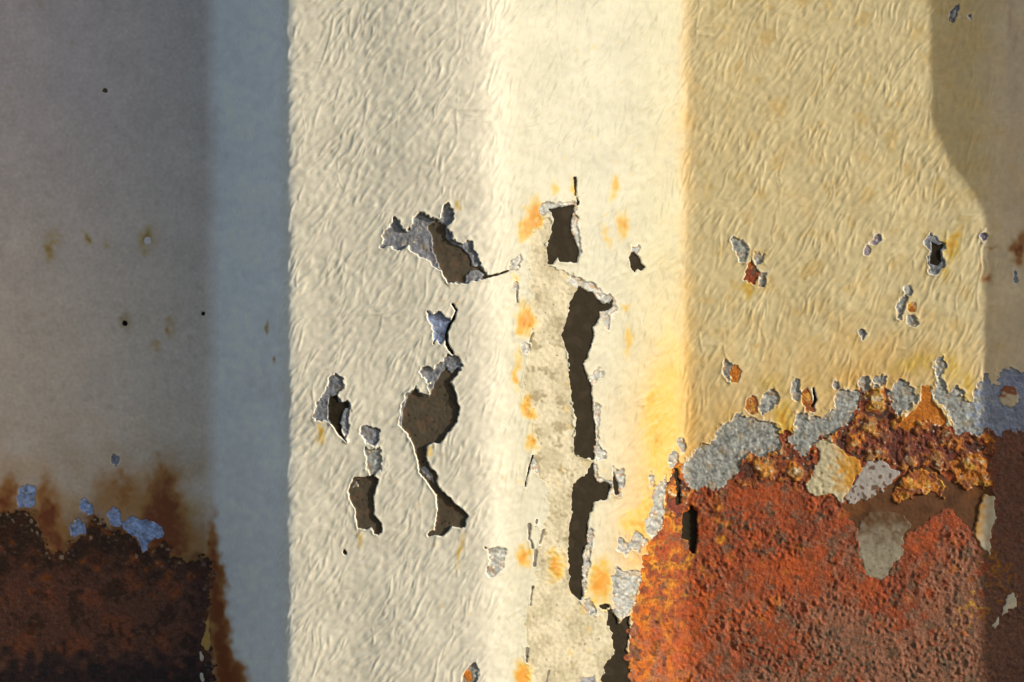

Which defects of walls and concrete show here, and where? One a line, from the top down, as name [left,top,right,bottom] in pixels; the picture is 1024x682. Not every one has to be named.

rust [515,172,578,254]
rust [599,173,632,252]
peeling [629,245,645,272]
peeling [730,237,767,287]
peeling [924,233,946,275]
rust [510,271,542,457]
peeling [745,379,817,415]
peeling [312,373,382,535]
peeling [380,203,625,682]
rust [582,303,1024,682]
rust [0,444,255,682]
rust [514,538,570,587]